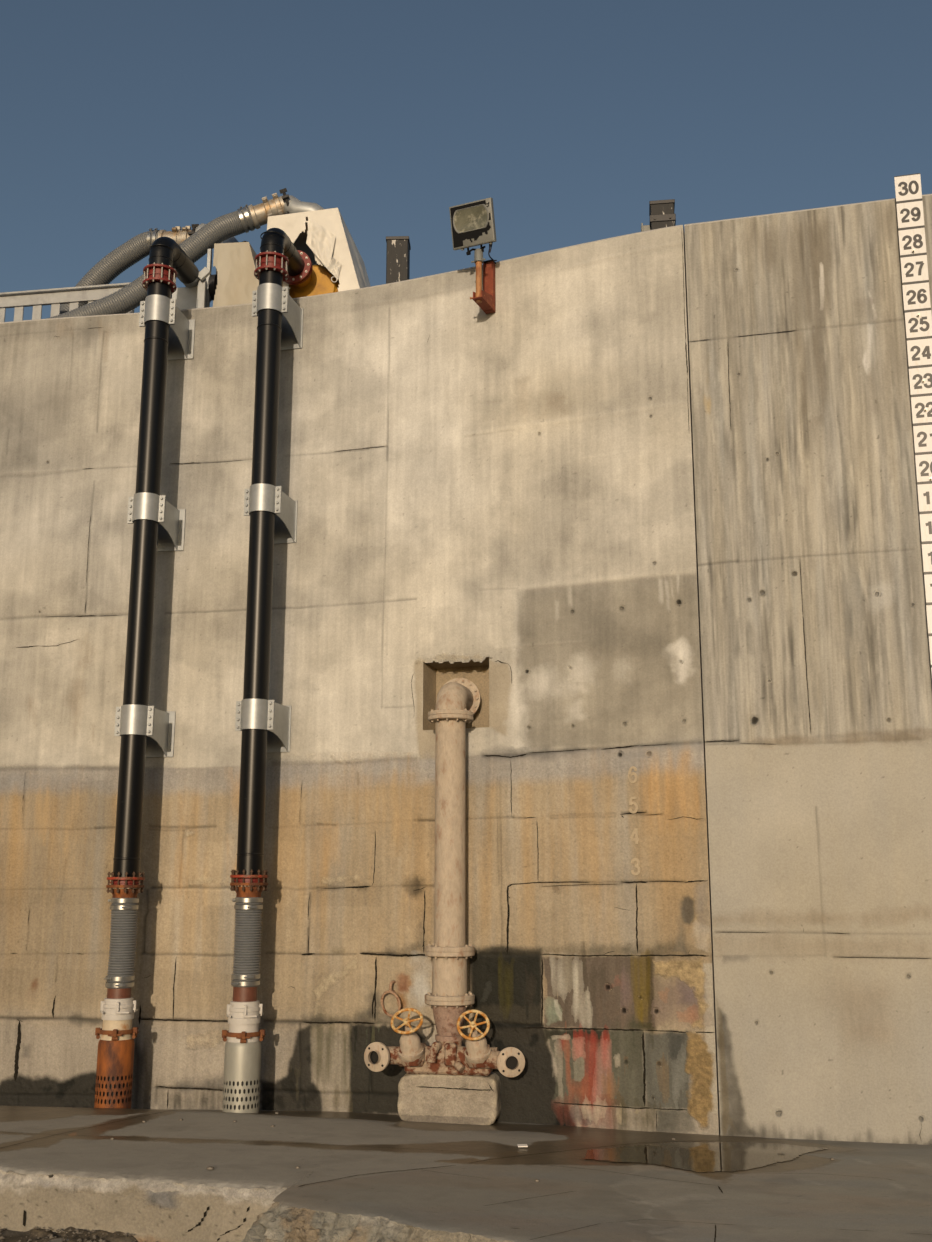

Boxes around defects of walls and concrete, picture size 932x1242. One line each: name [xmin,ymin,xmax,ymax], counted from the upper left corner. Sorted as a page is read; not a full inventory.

leakage [475,345,704,767]
peeling [543,942,629,1102]
spalling [650,956,718,1130]